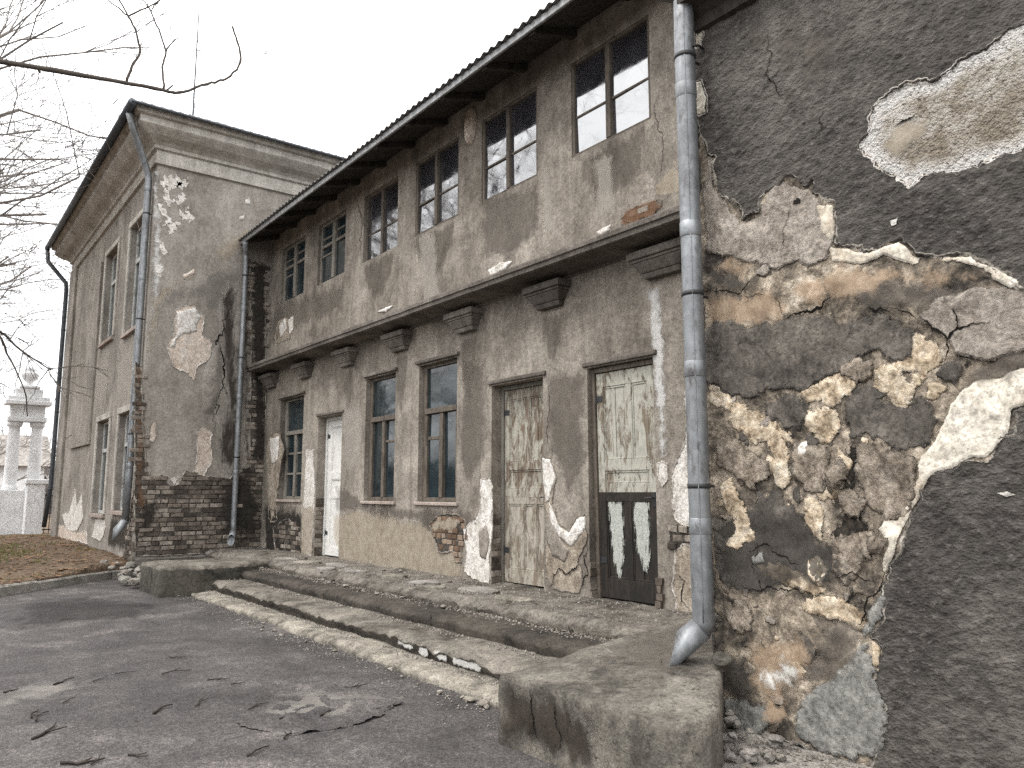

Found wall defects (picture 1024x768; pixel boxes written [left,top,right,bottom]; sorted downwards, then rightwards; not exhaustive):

crack [743,38,787,100]
spalling [857,22,1024,189]
leakage [420,235,438,299]
rust [622,201,658,225]
crack [212,293,235,428]
spalling [123,261,501,583]
flaking render [696,79,1024,767]
flaking render [58,489,106,544]
flaking render [541,456,598,598]
flaking render [608,392,692,612]
crack [736,543,888,627]
crack [528,687,562,756]